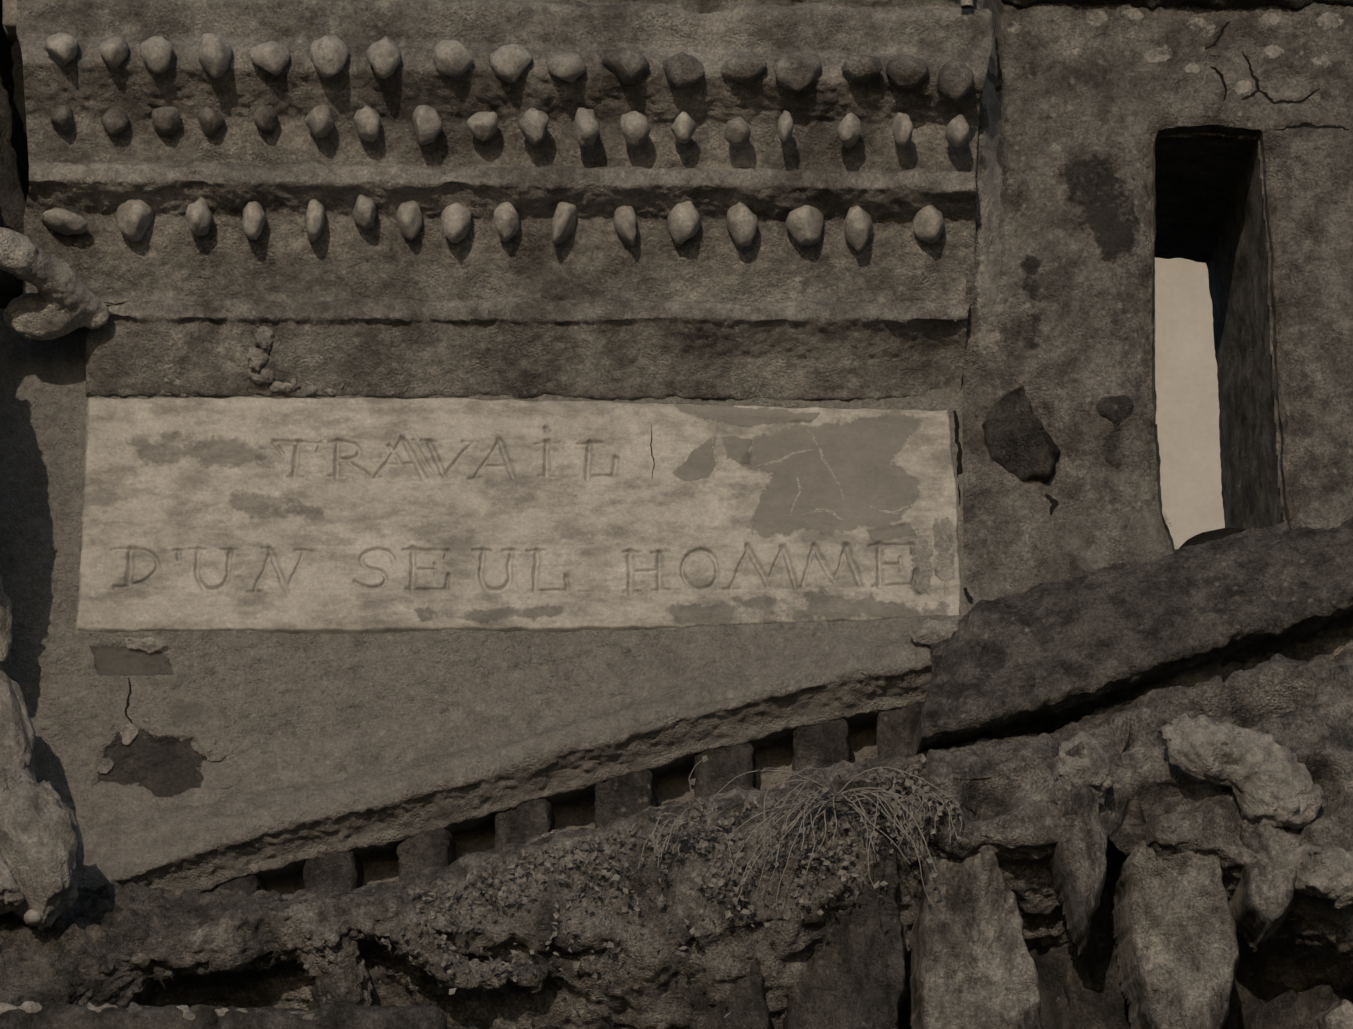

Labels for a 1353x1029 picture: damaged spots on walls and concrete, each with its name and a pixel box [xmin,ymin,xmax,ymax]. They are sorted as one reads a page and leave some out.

spalling [94,723,225,797]